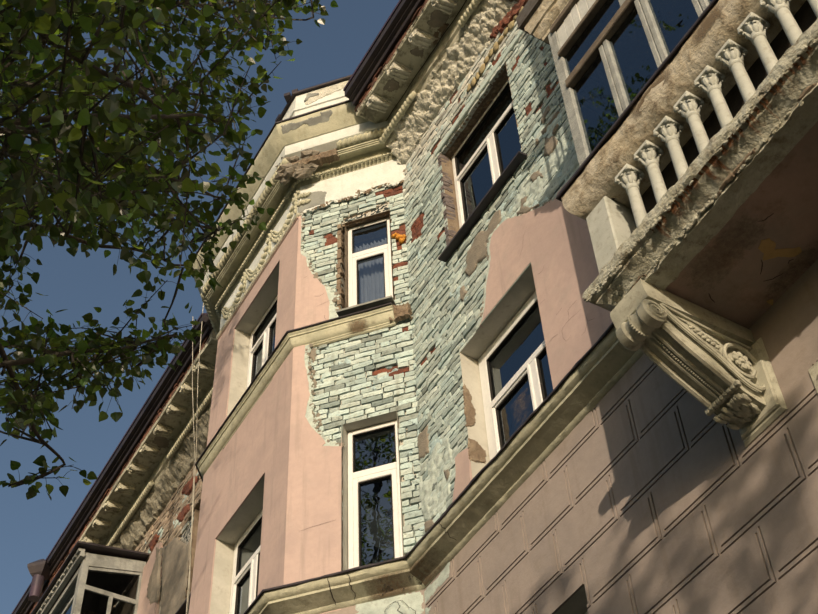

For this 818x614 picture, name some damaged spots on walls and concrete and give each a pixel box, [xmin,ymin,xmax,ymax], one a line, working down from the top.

spalling [274,149,320,185]
flaking render [301,0,579,554]
spalling [584,180,693,302]
spalling [618,83,817,303]
corrosion [650,38,816,238]
spalling [703,32,818,167]
flaking render [135,461,203,563]
peeling [355,562,450,614]